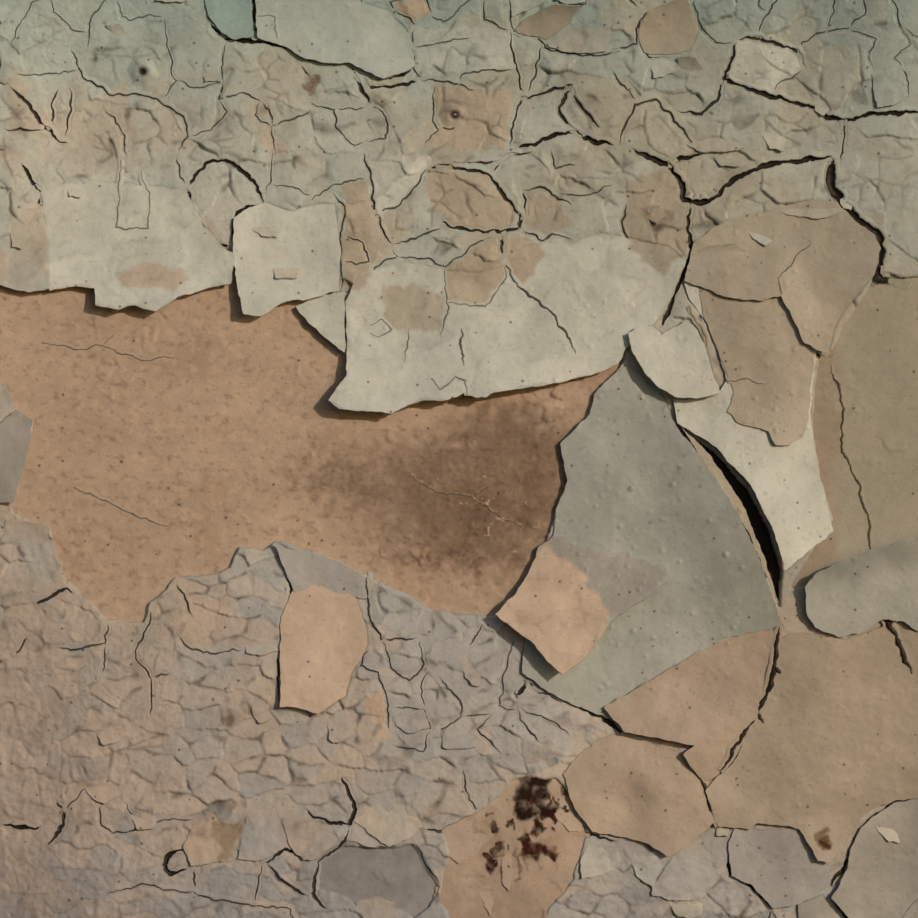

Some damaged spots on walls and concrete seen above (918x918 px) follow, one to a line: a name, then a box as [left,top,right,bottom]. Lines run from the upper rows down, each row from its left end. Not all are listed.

crack [0,0,918,396]
peeling [0,182,686,714]
peeling [319,198,918,918]
crack [273,652,281,703]
crack [357,571,625,754]
crack [682,627,783,828]
crack [881,619,915,675]
crack [103,775,360,918]
peeling [238,796,335,861]
rust [482,777,569,877]
crack [725,852,773,918]
crack [822,799,909,918]